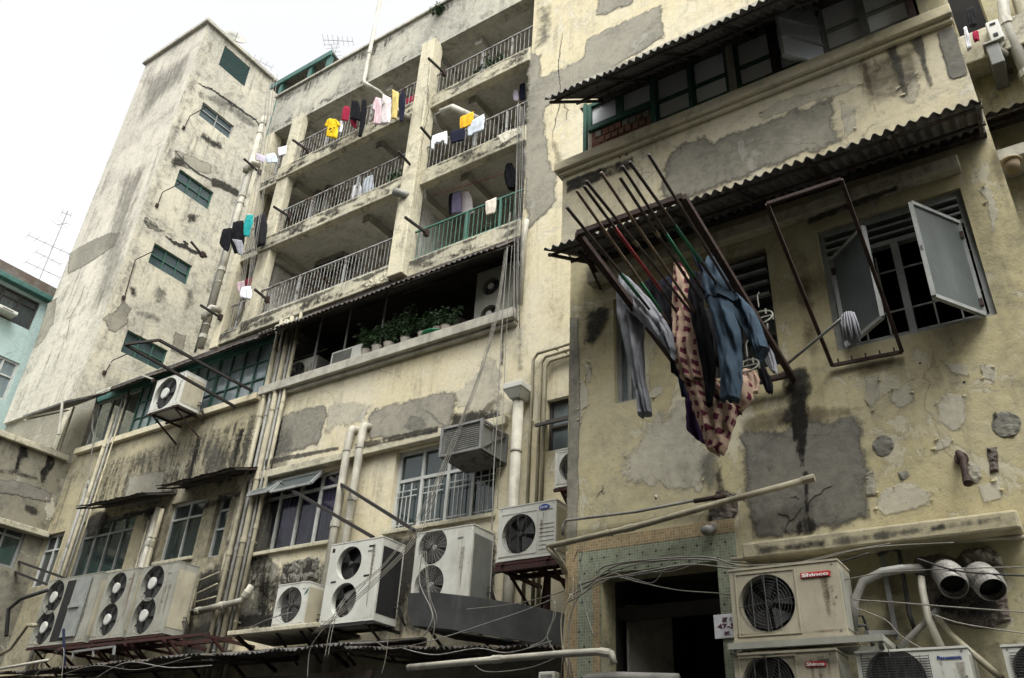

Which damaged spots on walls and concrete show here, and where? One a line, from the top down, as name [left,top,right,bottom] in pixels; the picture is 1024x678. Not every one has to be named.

crack [198,83,259,125]
crack [552,39,568,137]
water stain [863,36,933,96]
crack [165,236,207,257]
peeling [620,401,708,493]
water stain [745,367,847,553]
peeling [931,388,966,451]
water stain [86,415,339,654]
crack [778,486,832,534]
peeling [873,471,934,515]